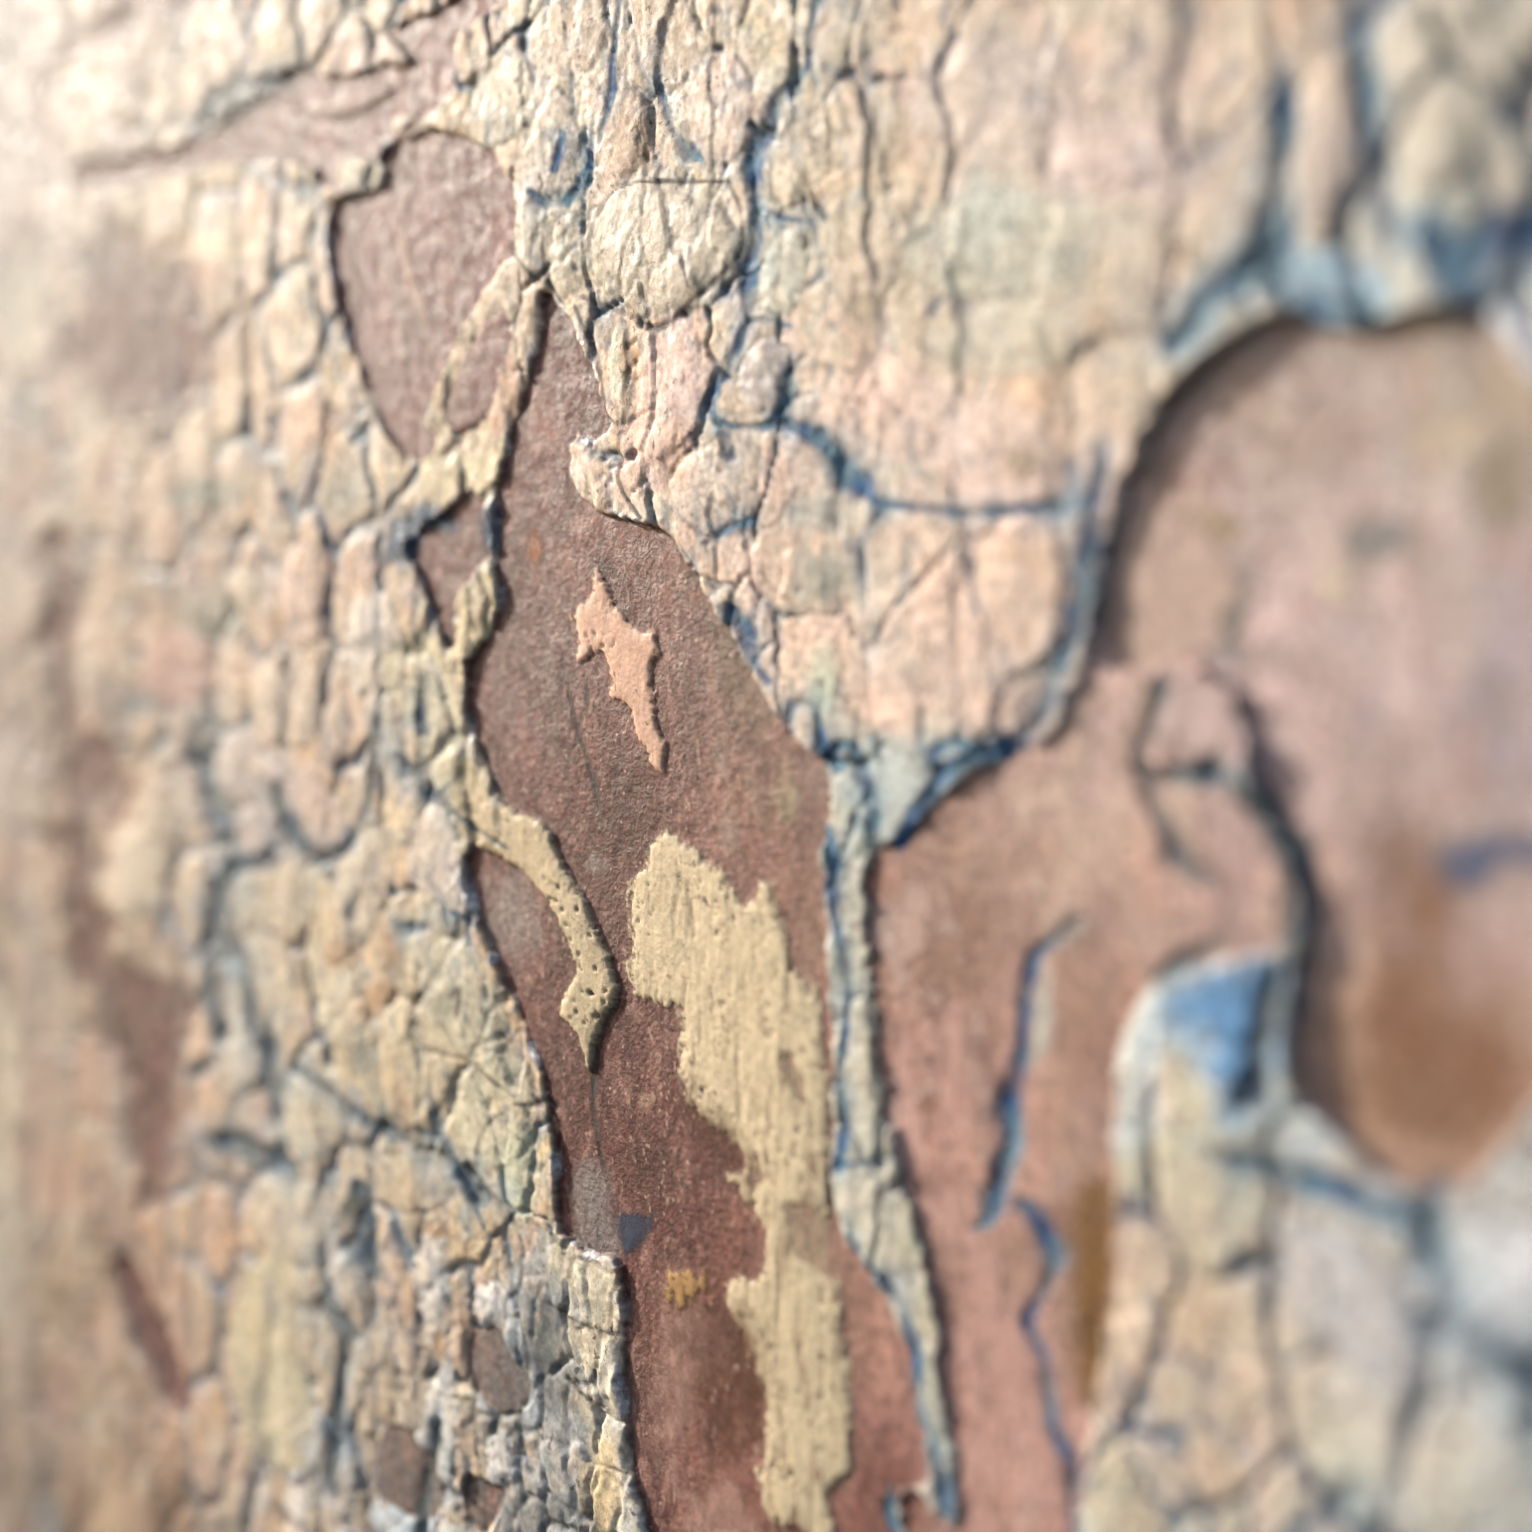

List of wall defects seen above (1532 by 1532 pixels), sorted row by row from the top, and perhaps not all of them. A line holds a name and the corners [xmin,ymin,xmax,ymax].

peeling [78,0,517,461]
crack [513,0,1107,851]
crack [1160,201,1374,356]
crack [1268,65,1301,165]
crack [347,1179,382,1282]
crack [184,695,599,1221]
crack [824,826,843,946]
crack [833,988,882,1173]
peeling [398,292,1532,1532]
crack [973,931,1074,1480]
crack [1132,678,1319,1113]
peeling [378,1425,445,1518]